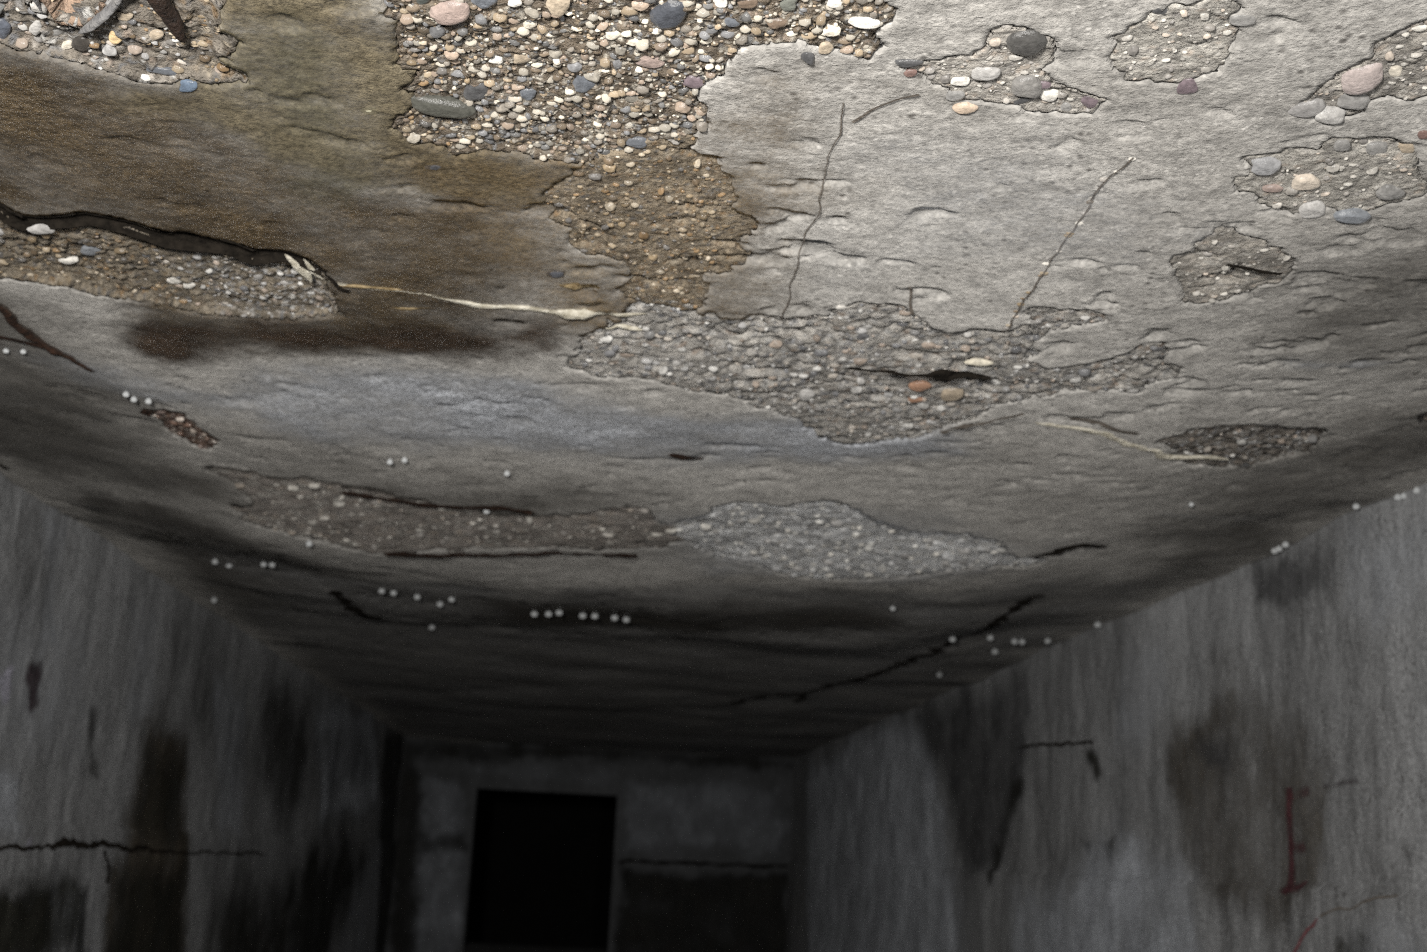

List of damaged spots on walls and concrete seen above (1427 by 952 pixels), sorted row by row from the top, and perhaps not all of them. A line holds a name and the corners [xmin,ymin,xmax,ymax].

spalling [0,0,248,92]
spalling [0,207,343,321]
crack [0,203,351,293]
damp [0,0,647,362]
spalling [383,0,1180,445]
crack [781,94,920,320]
crack [1002,157,1136,332]
spalling [205,466,1045,580]
damp [26,663,41,711]
damp [83,496,1137,952]
damp [0,880,85,952]
crack [0,837,263,884]